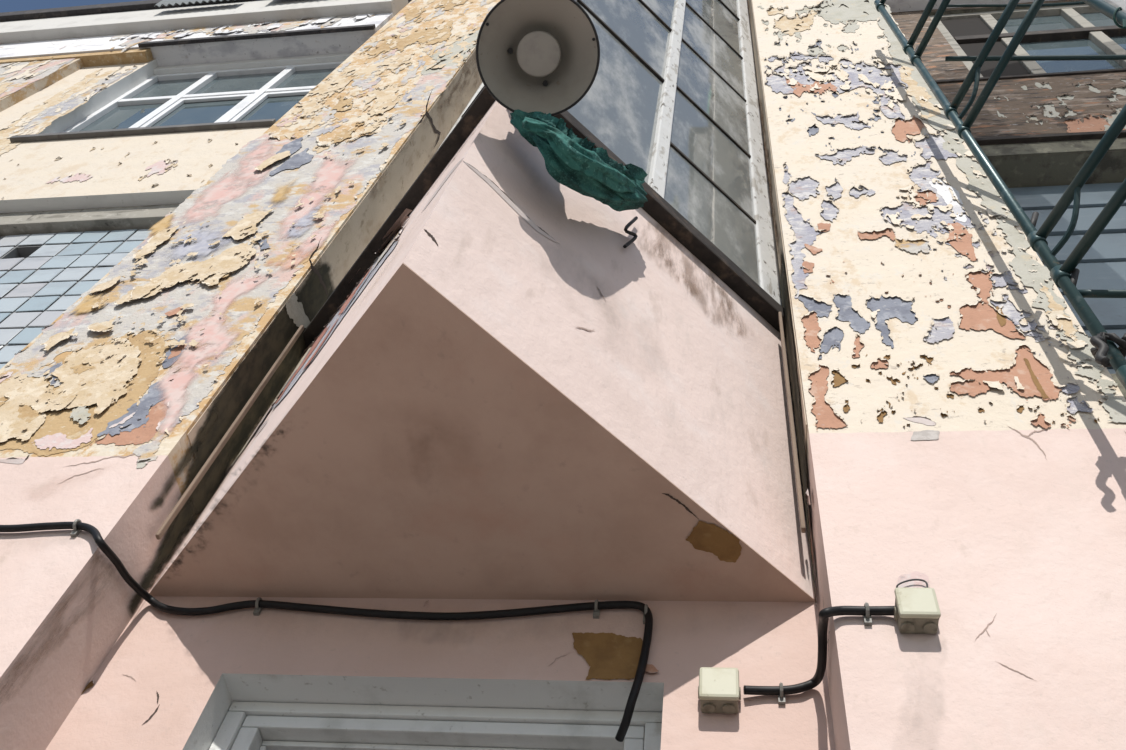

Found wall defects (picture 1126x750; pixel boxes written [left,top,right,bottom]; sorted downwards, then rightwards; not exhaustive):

peeling [0,0,495,468]
peeling [757,0,1126,429]
peeling [572,632,658,680]
peeling [686,521,742,563]